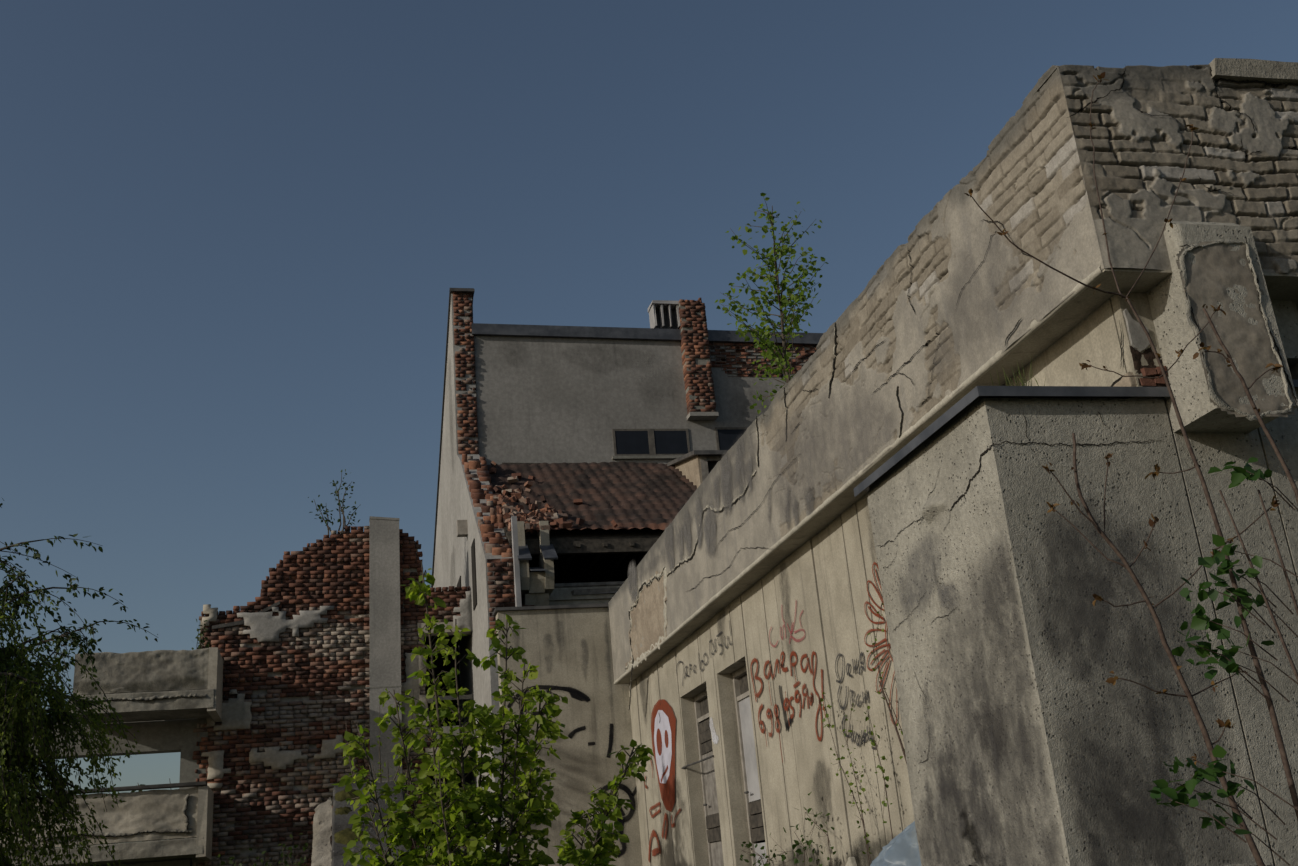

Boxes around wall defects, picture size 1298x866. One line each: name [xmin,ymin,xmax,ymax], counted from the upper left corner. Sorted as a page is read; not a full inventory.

spalling [1111,309,1168,387]
crack [628,219,1029,710]
crack [877,412,1160,568]
flaking render [625,568,668,671]